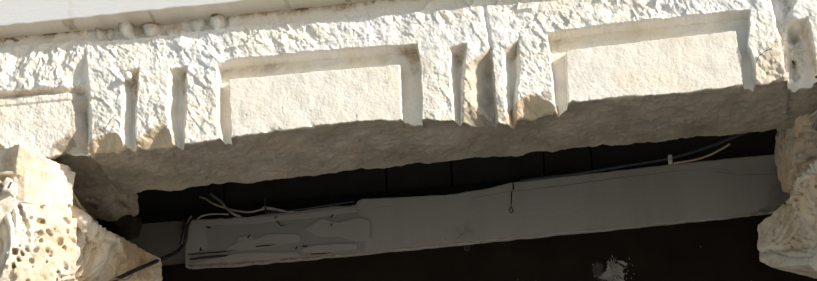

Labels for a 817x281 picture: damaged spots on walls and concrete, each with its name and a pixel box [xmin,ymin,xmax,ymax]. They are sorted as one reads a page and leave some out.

spalling [462,45,560,129]
spalling [754,35,800,88]
peeling [186,207,371,267]